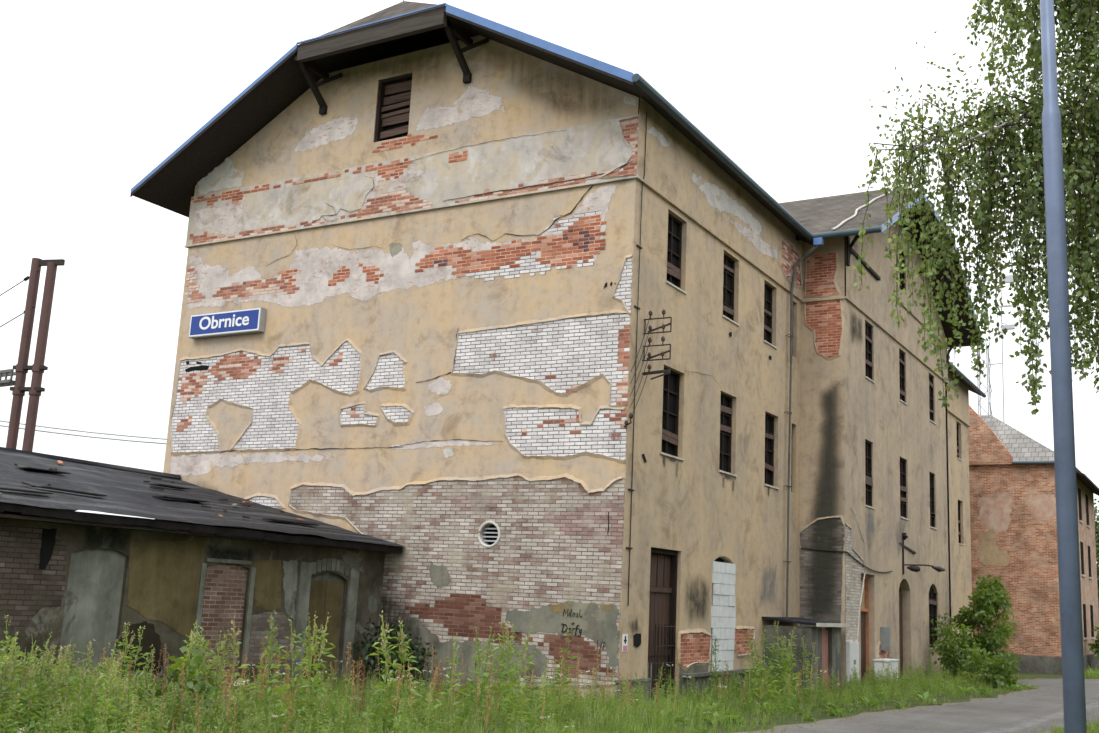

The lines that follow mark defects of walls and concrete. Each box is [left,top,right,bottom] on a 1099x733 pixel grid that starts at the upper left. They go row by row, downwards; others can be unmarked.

crack [268,176,386,265]
flaking render [185,83,675,309]
crack [445,161,633,241]
flaking render [691,171,845,361]
flaking render [169,254,641,691]
water stain [811,388,838,613]